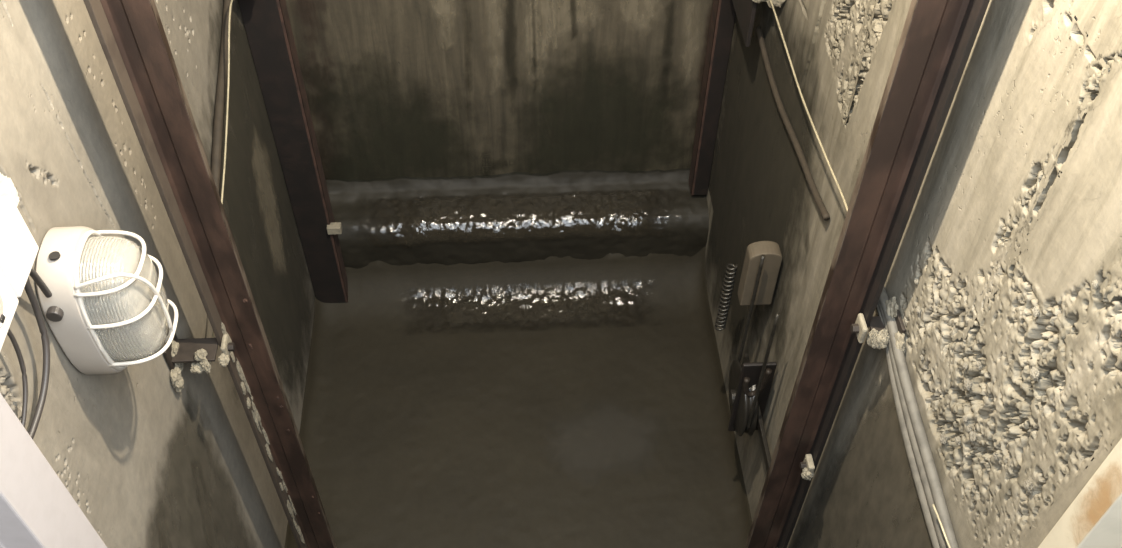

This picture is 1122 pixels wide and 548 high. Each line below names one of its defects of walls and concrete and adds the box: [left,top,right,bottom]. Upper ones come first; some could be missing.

leakage [329,76,488,182]
leakage [431,0,456,47]
leakage [486,0,684,176]
leakage [681,0,699,84]
spalling [822,0,896,134]
flaking render [0,172,20,207]
spalling [897,45,1122,548]